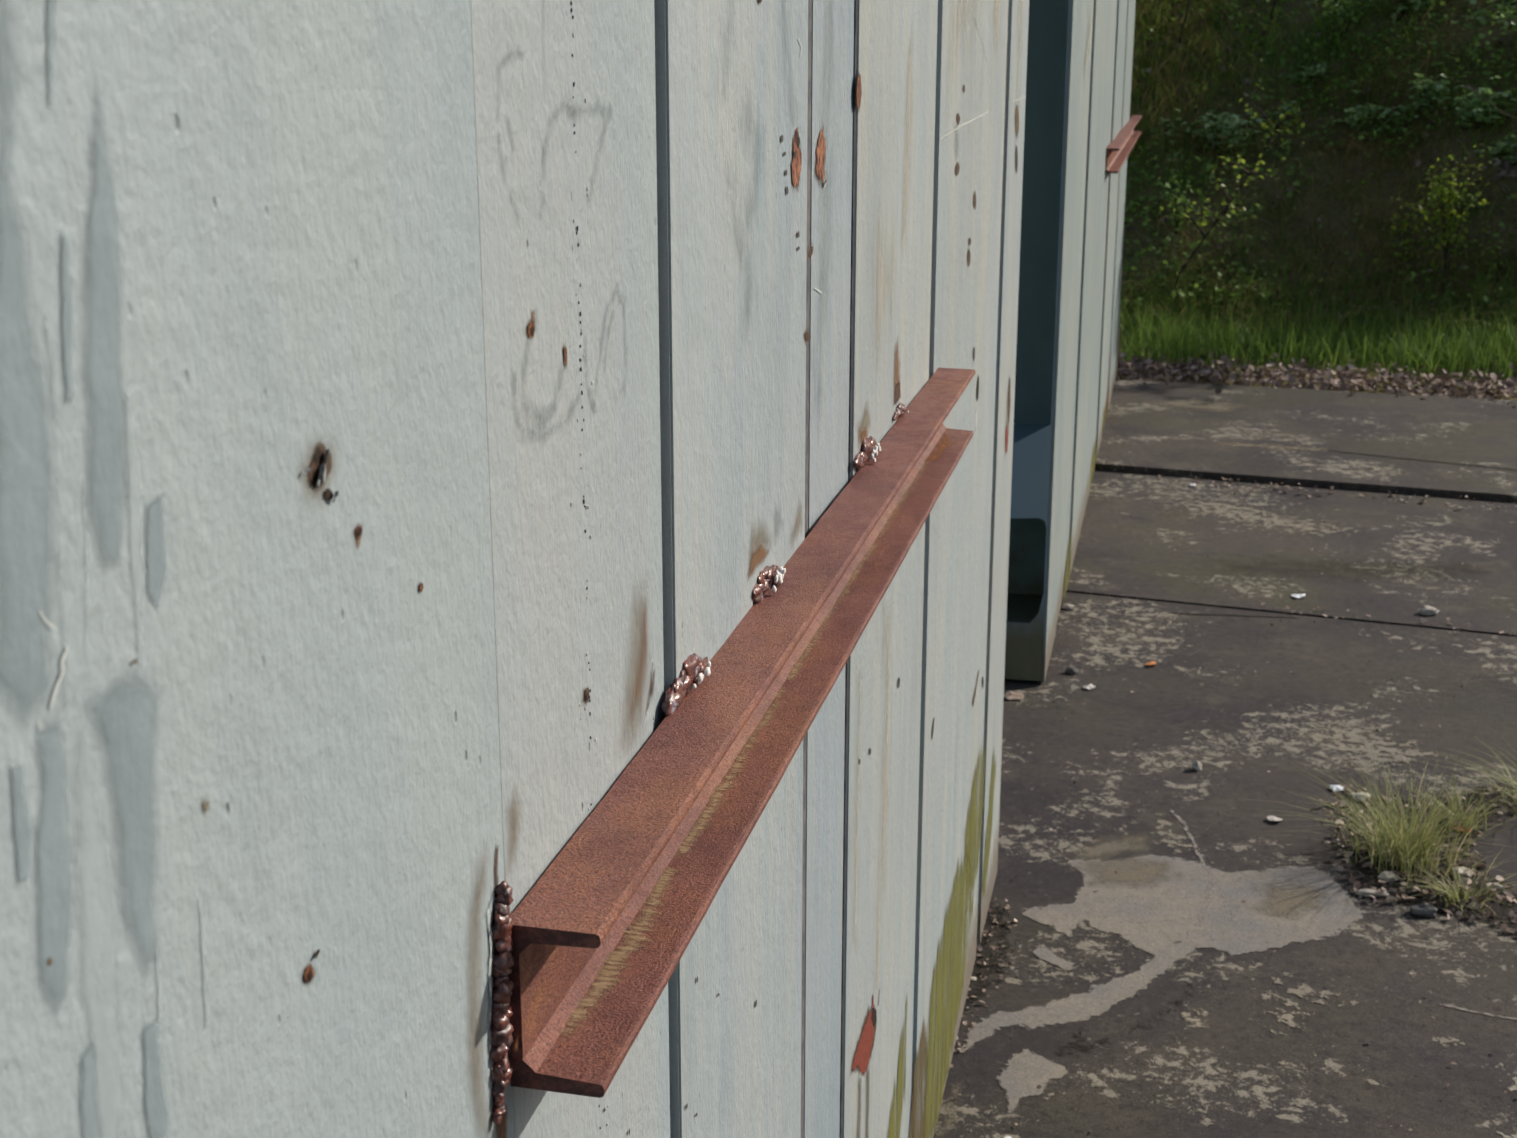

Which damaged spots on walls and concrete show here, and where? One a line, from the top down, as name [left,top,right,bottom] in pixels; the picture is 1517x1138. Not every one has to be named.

corrosion [791,126,827,187]
water stain [0,0,50,711]
water stain [62,118,167,664]
corrosion [859,410,869,442]
corrosion [304,443,338,502]
corrosion [749,533,767,576]
corrosion [631,654,655,719]
water stain [12,682,168,1138]
corrosion [473,848,498,1081]
water stain [888,749,996,1138]
corrosion [852,1012,875,1074]
water stain [857,1072,869,1138]